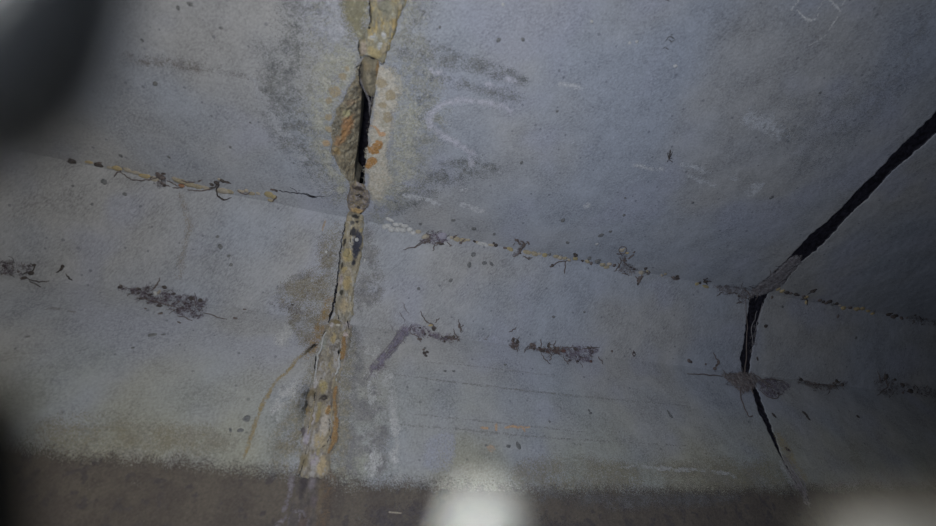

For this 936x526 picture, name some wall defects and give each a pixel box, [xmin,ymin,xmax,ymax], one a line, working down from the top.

crack [279,187,324,198]
corrosion [365,125,386,169]
corrosion [243,294,335,459]
leakage [34,211,936,526]